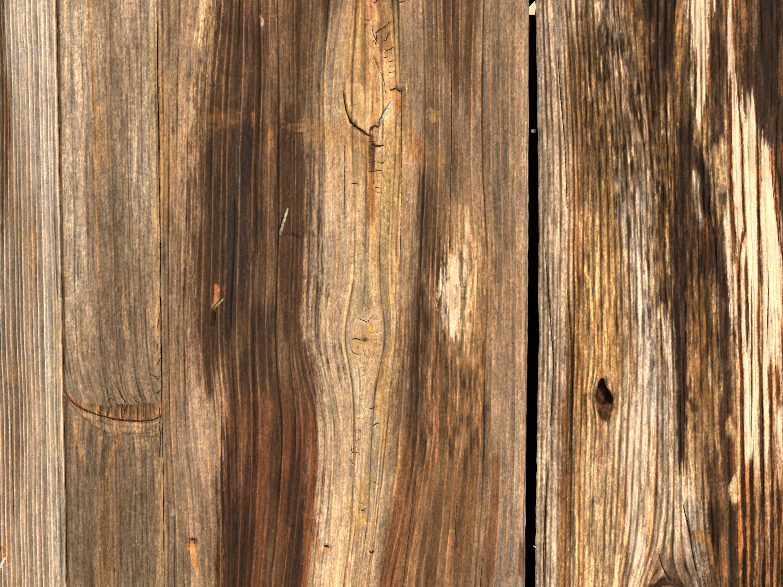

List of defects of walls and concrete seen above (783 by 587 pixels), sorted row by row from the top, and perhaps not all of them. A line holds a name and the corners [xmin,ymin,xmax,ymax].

crack [343,0,402,270]
crack [65,313,161,455]